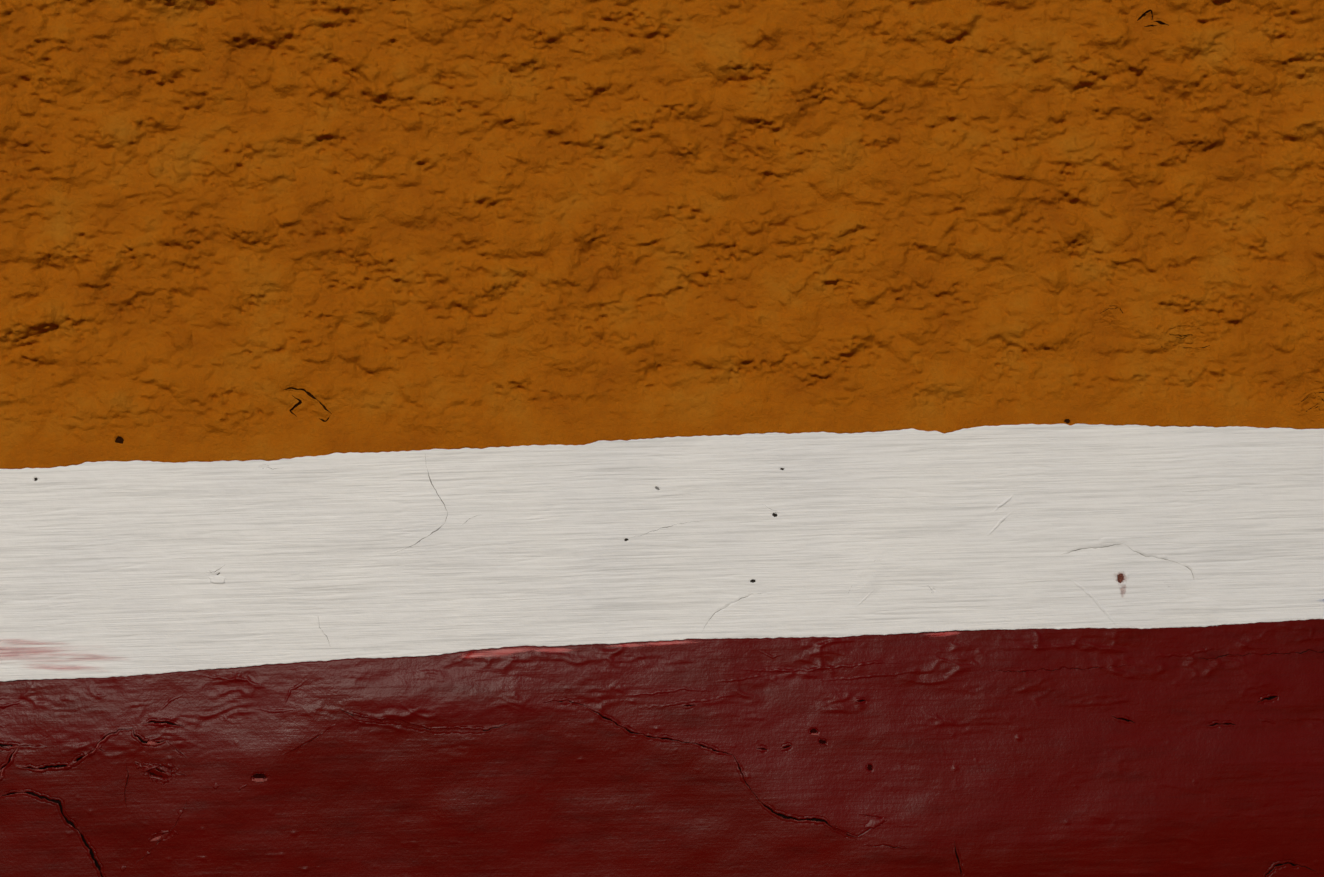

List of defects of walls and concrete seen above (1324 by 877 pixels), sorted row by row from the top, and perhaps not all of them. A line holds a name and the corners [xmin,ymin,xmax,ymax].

crack [0,719,187,877]